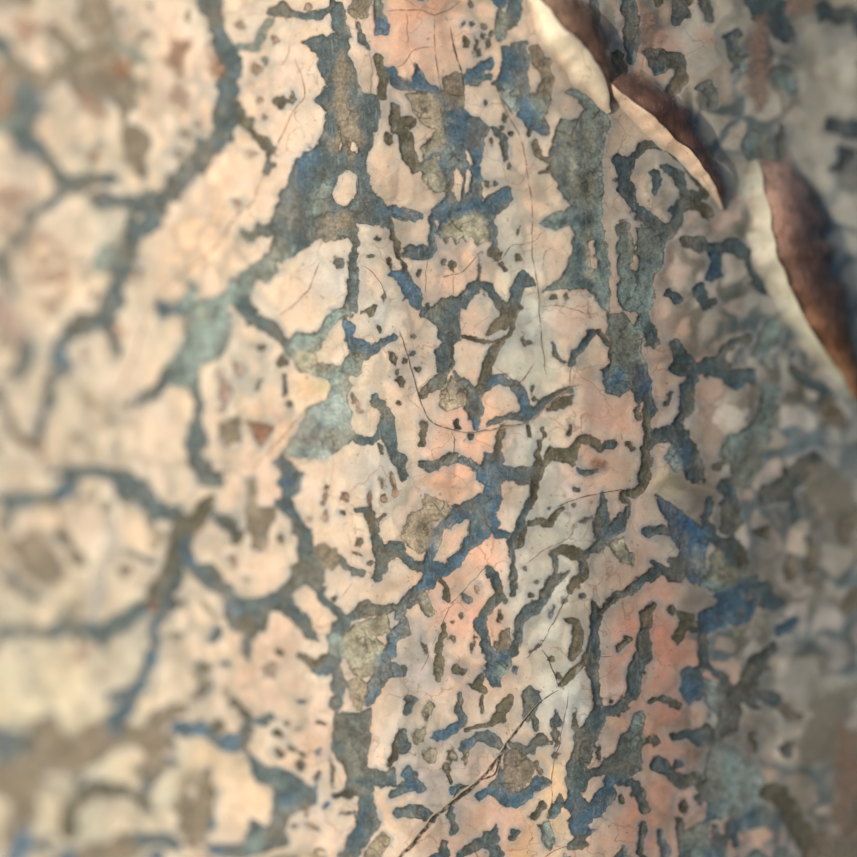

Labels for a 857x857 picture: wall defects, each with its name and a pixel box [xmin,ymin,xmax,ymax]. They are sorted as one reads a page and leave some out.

peeling [611,0,718,108]
peeling [721,28,752,74]
peeling [744,0,797,44]
peeling [769,64,799,96]
peeling [0,0,618,857]
peeling [788,351,854,430]
peeling [839,586,857,616]
crack [398,567,588,857]